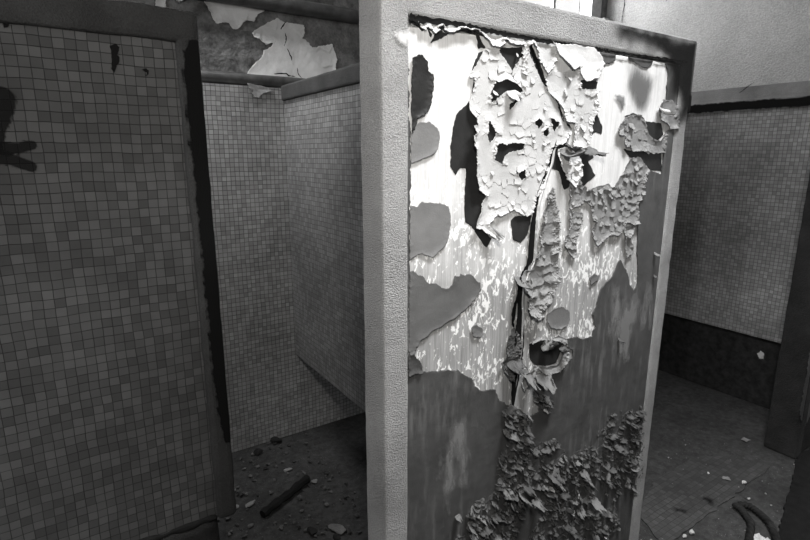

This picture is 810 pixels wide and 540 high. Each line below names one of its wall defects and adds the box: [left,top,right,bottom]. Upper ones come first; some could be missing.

peeling [188,1,337,78]
peeling [408,23,681,540]